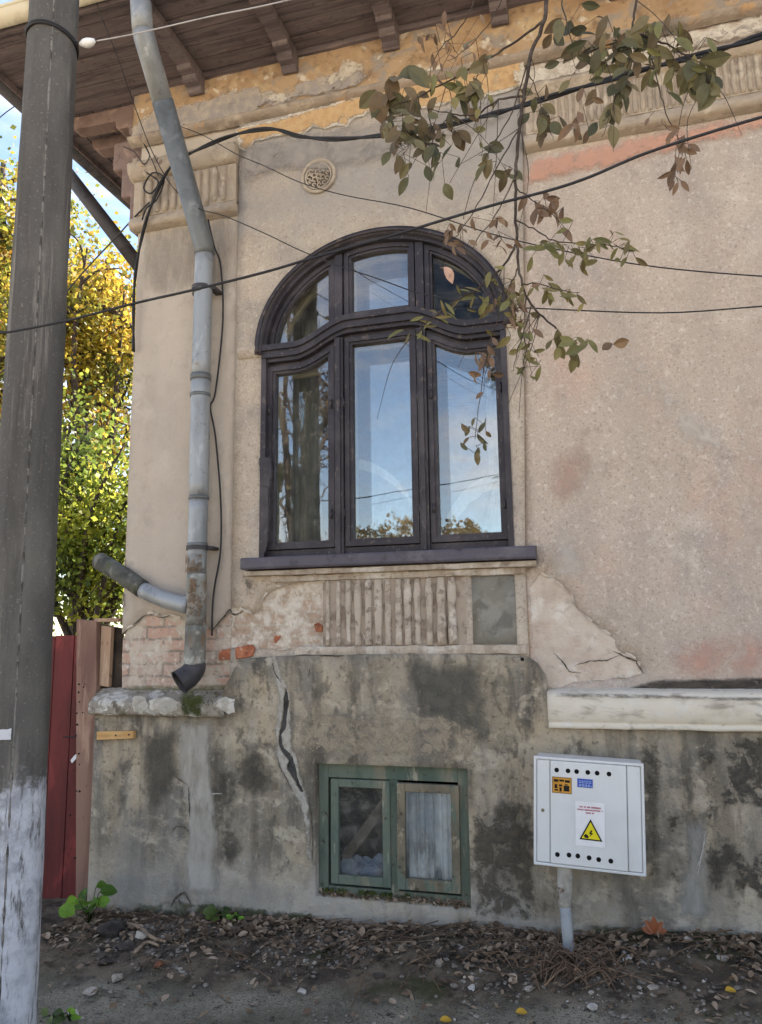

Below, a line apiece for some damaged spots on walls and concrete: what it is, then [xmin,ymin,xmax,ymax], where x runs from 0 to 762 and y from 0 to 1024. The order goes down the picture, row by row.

peeling [131,110,160,136]
peeling [176,60,370,151]
spalling [122,611,186,714]
rust [185,554,202,616]
spalling [192,581,327,714]
spalling [520,573,642,688]
crack [554,651,643,673]
water stain [145,724,270,892]
crack [272,655,343,865]
water stain [472,803,533,920]
water stain [668,738,762,917]